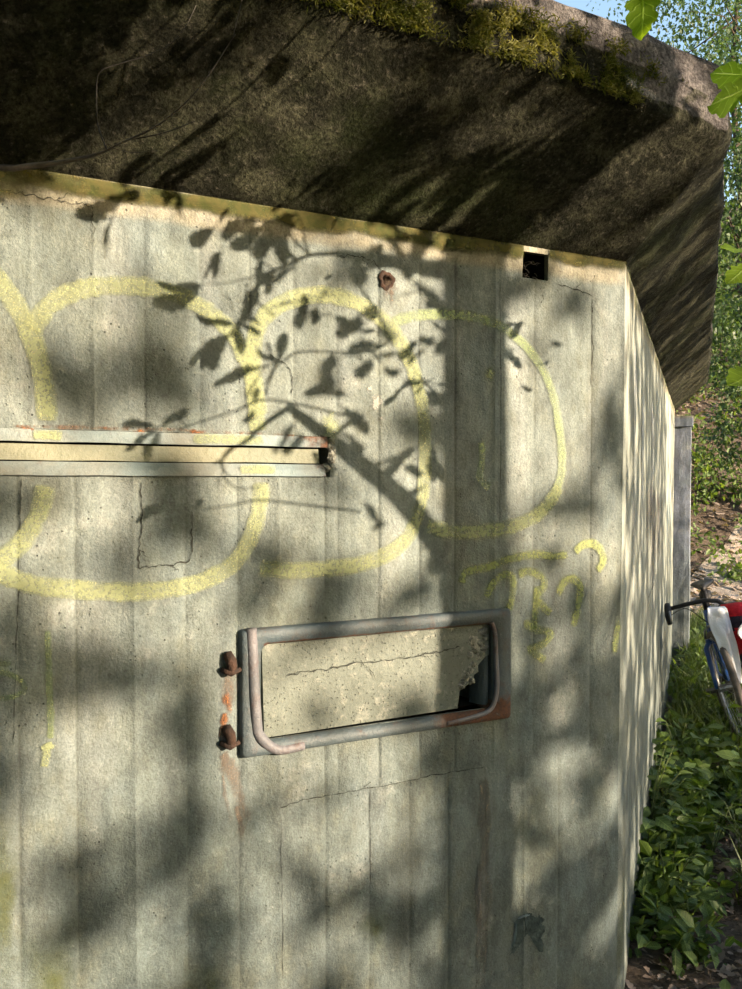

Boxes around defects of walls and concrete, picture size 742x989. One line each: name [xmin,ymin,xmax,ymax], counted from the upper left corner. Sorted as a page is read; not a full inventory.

crack [137,485,193,571]
crack [288,646,459,678]
spalling [458,627,489,690]
rust [221,675,232,736]
crack [281,767,486,967]